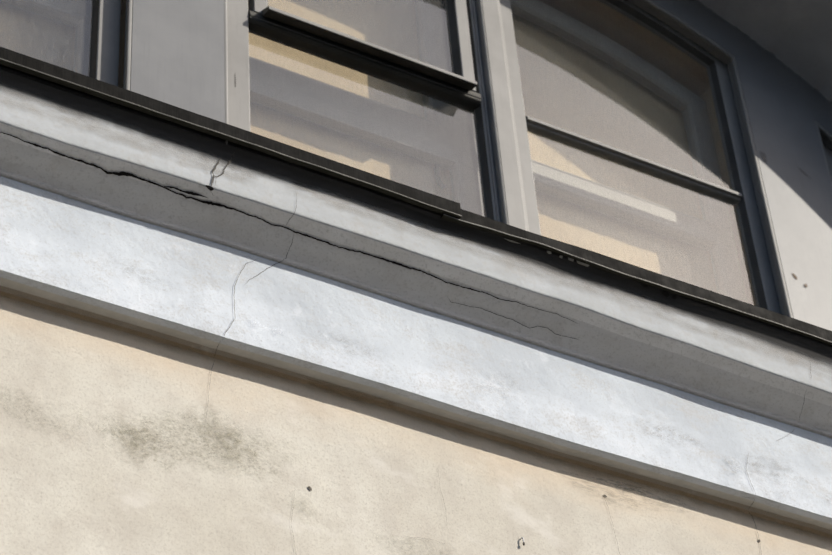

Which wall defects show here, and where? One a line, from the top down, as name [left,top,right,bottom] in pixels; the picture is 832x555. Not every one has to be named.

crack [0,132,579,436]